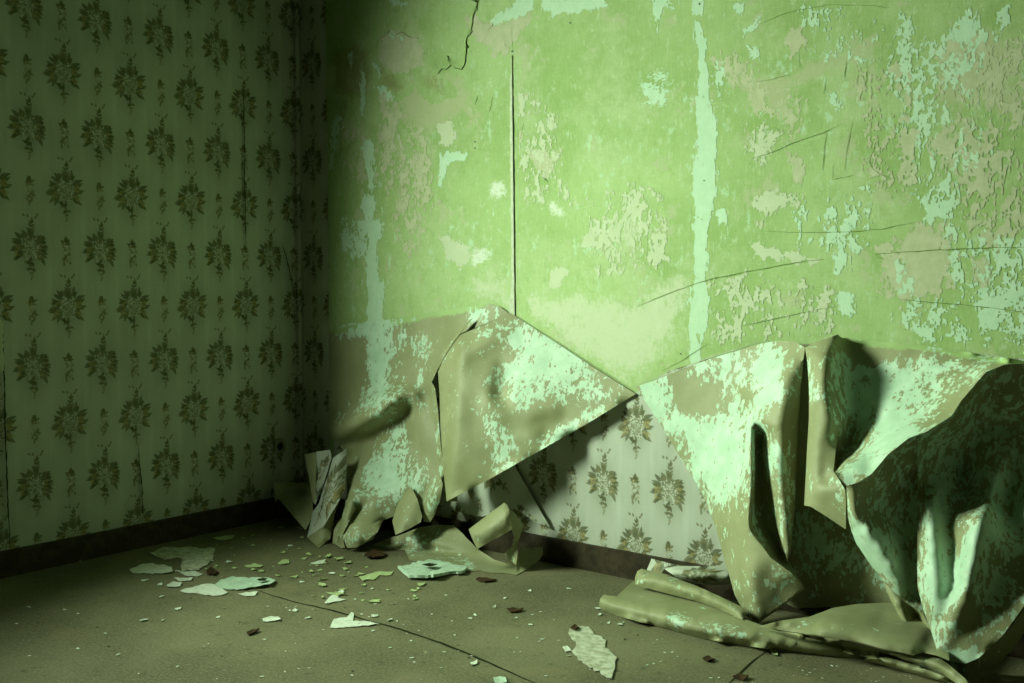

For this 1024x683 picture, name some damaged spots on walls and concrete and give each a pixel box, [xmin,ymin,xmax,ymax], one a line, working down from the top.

crack [433,0,493,74]
peeling [327,29,493,330]
peeling [516,91,572,210]
peeling [549,265,569,289]
peeling [581,182,671,279]
peeling [686,0,1024,364]